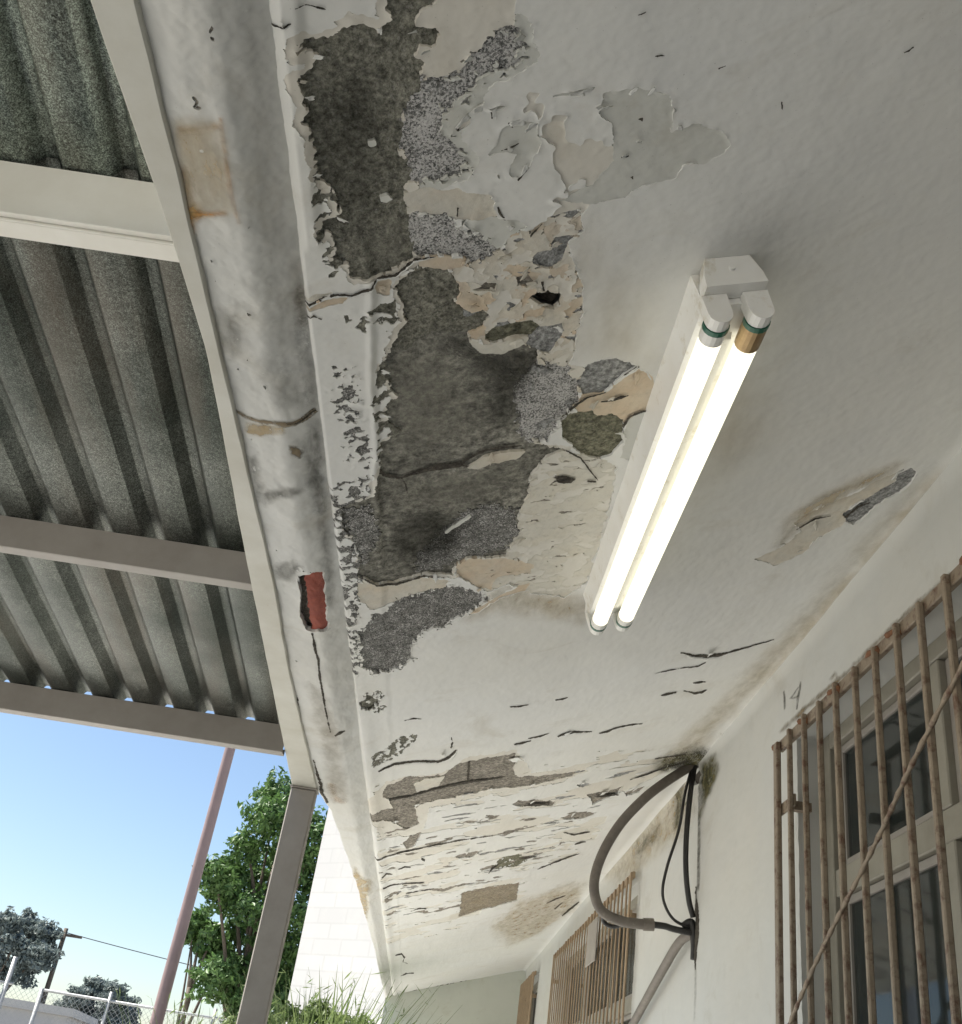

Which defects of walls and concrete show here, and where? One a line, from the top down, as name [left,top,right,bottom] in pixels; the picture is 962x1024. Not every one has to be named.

crack [305,256,436,320]
spalling [283,0,730,677]
crack [236,408,317,458]
crack [379,445,522,493]
peeling [756,468,916,565]
crack [297,633,345,737]
peeling [359,690,387,712]
crack [659,639,774,698]
damp [659,751,717,810]
peeling [368,749,667,943]